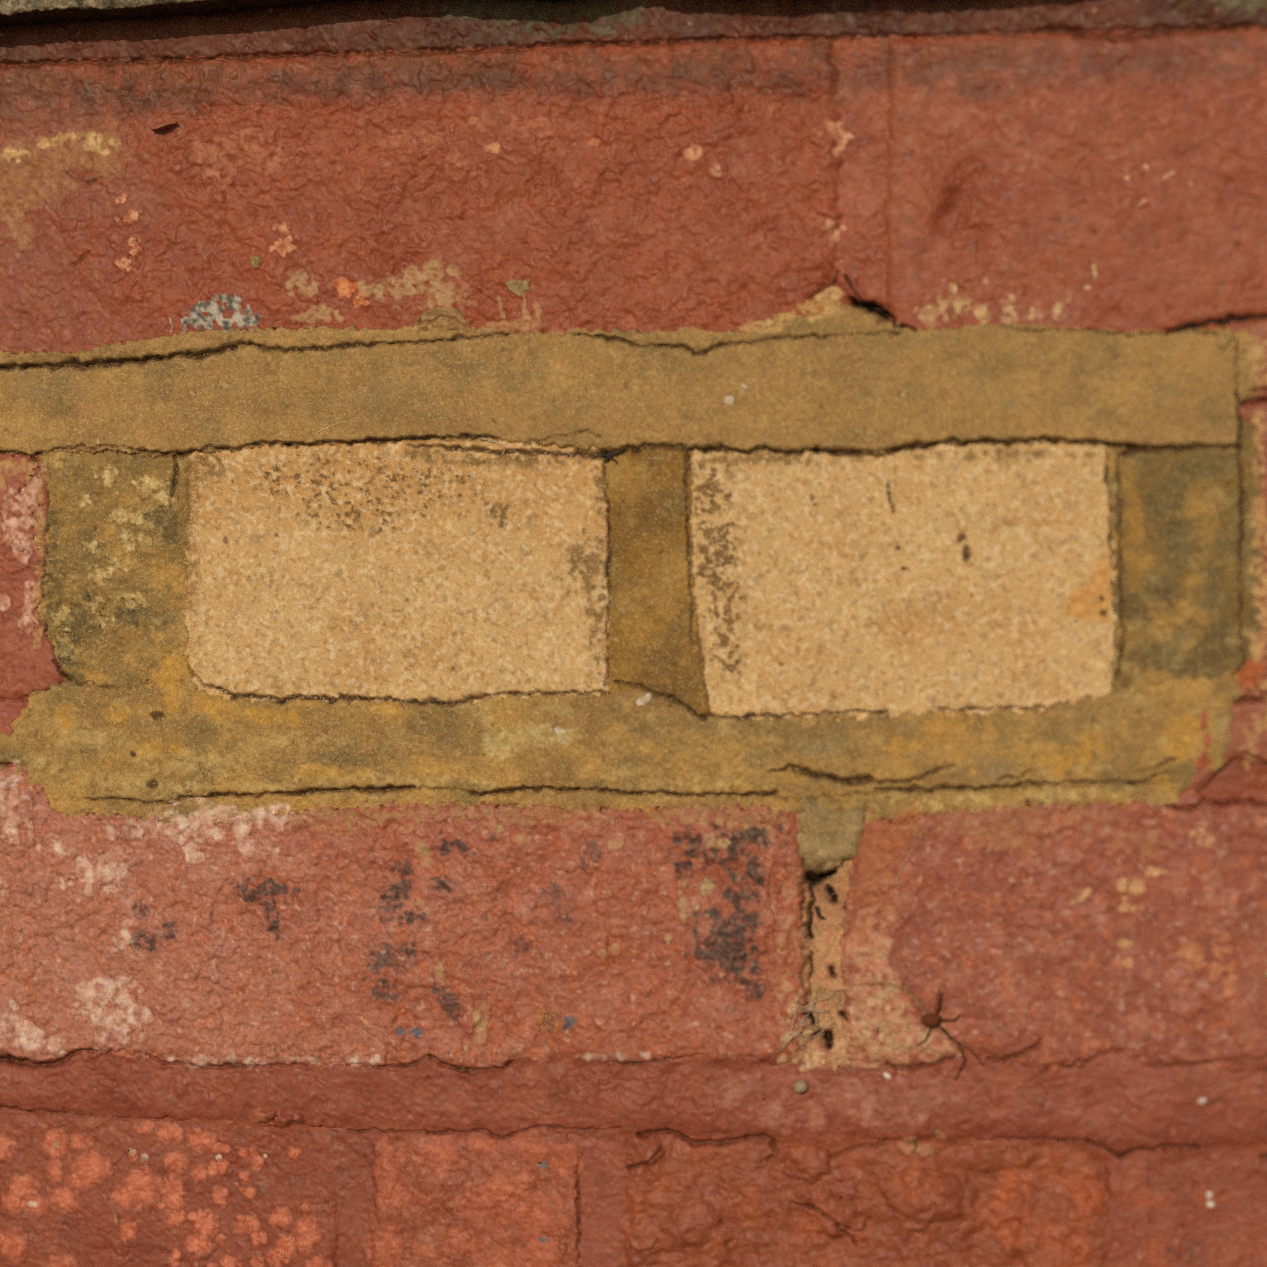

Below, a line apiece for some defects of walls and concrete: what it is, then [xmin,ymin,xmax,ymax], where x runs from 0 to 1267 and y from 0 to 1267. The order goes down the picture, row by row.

peeling [162,292,269,335]
peeling [413,305,472,331]
peeling [0,461,50,634]
spalling [1064,556,1115,624]
spalling [148,709,168,722]
spalling [143,776,161,791]
peeling [764,801,969,1091]